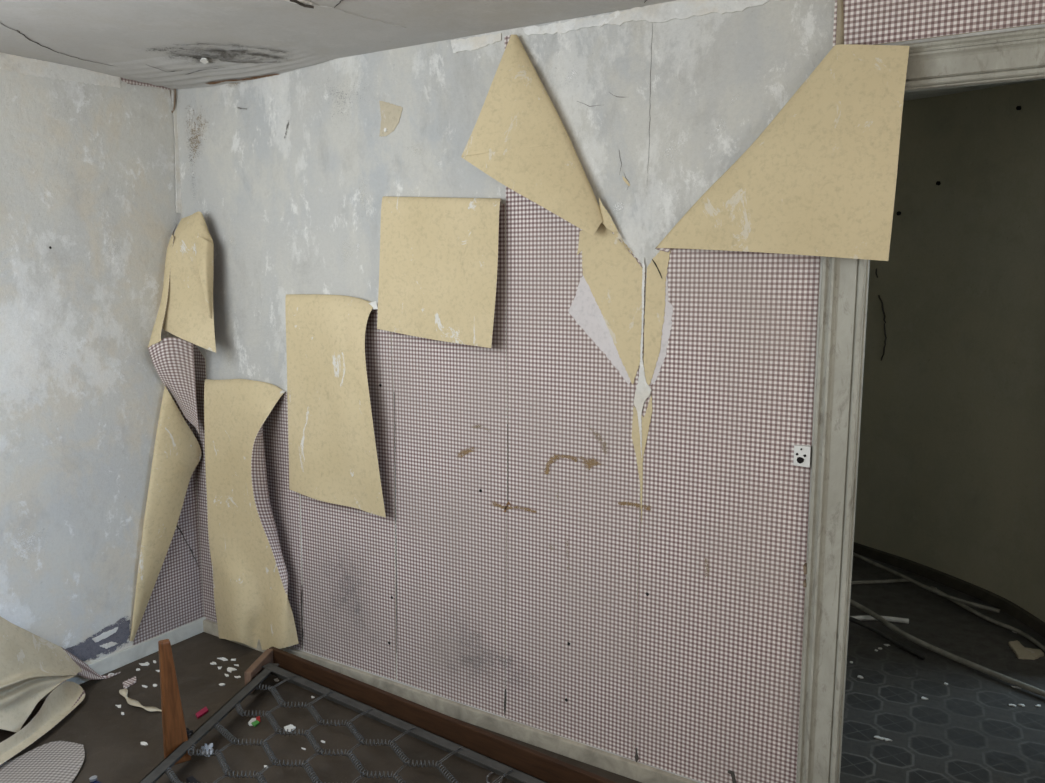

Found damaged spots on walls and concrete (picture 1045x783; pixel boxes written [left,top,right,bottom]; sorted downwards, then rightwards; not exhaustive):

crack [1,23,112,66]
flaking render [450,33,502,53]
crack [875,269,887,361]